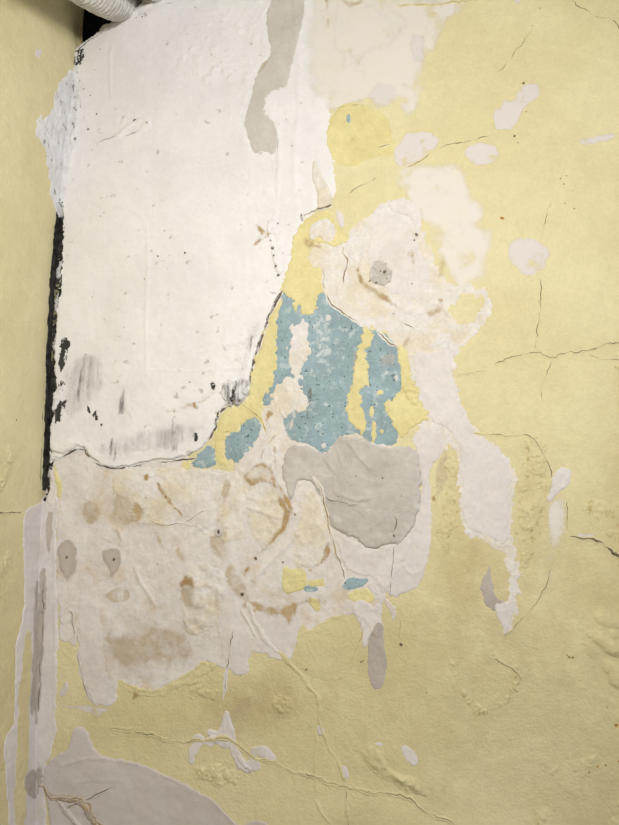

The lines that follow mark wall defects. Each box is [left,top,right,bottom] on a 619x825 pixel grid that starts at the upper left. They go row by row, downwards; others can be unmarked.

spalling [74,9,112,60]
peeling [326,102,395,166]
crack [406,135,489,168]
peeling [181,160,429,470]
crack [453,278,619,402]
peeling [46,465,62,506]
crack [472,432,553,480]
crack [564,497,619,559]
peeling [296,577,382,682]
crack [485,559,555,680]
peeling [188,711,276,774]
crack [35,780,115,825]